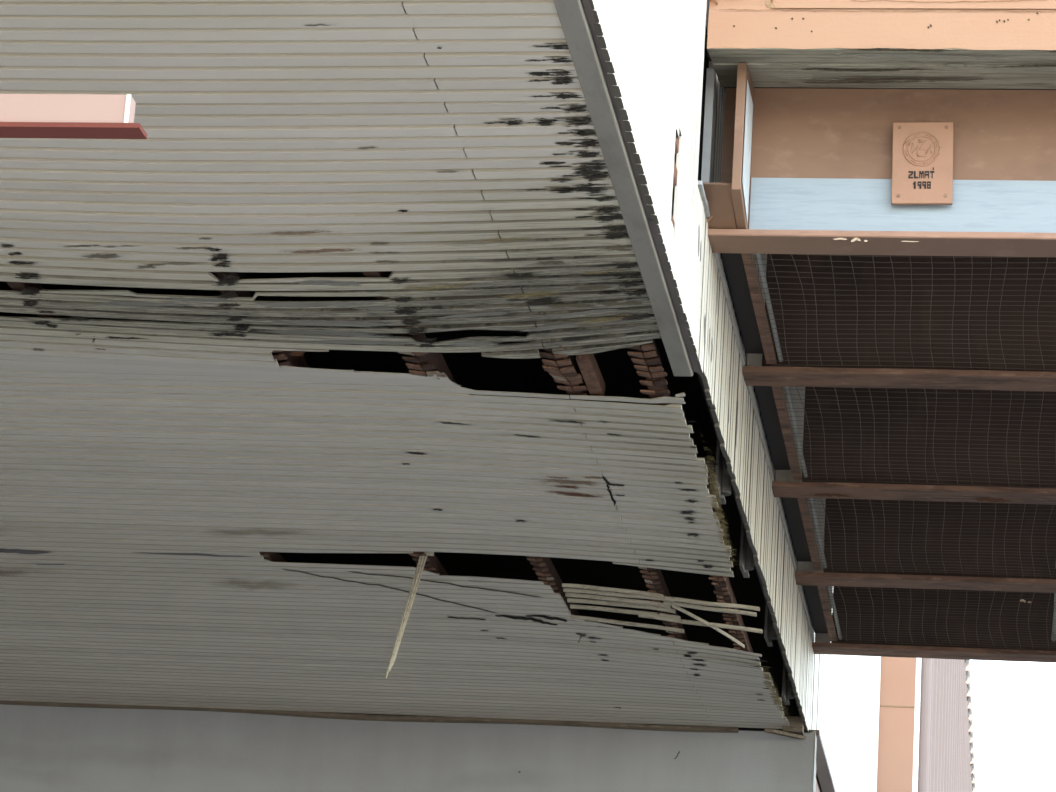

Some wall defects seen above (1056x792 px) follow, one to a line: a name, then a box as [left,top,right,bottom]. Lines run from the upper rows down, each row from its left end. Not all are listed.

damp [779,48,993,84]
damp [481,42,654,322]
peeling [92,298,228,306]
peeling [245,301,426,356]